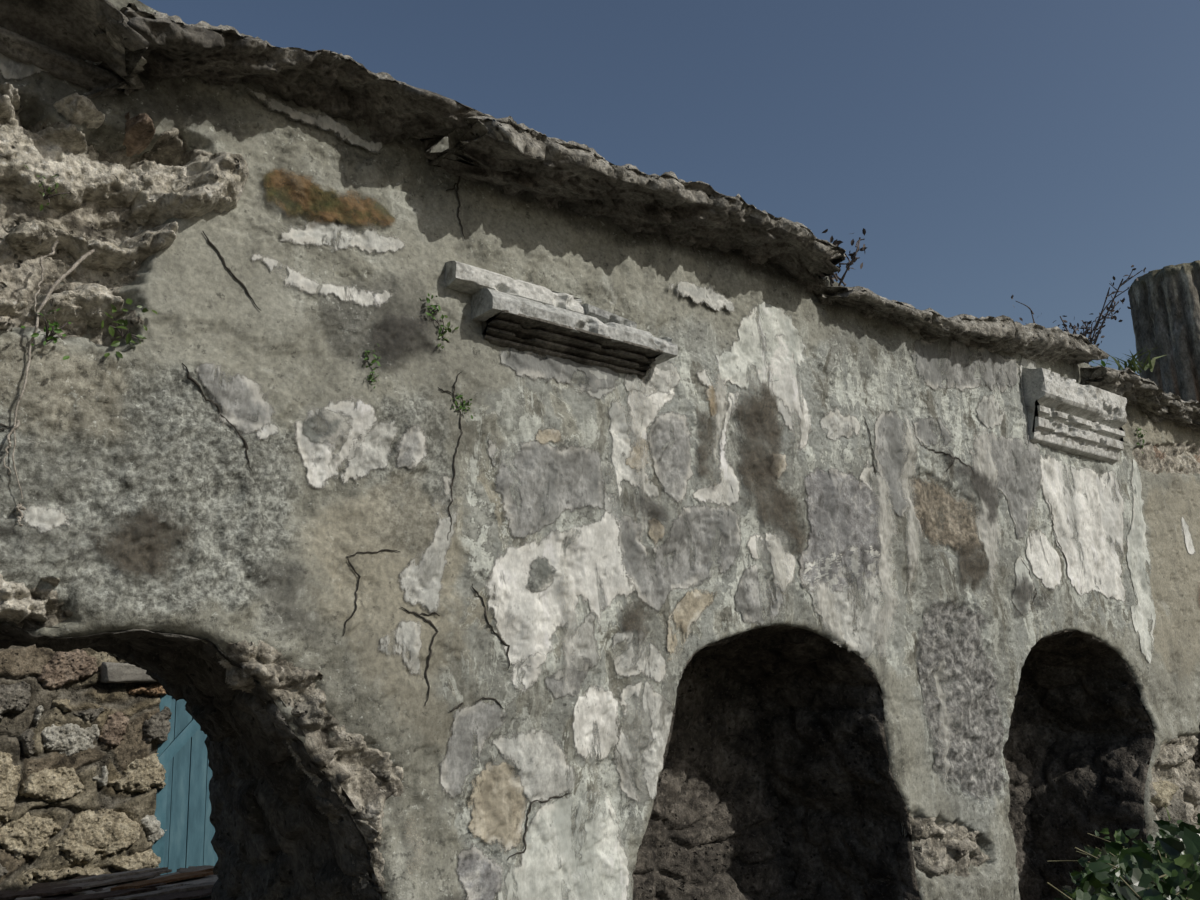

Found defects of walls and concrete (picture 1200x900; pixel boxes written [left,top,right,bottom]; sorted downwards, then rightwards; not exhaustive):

spalling [0,53,249,348]
crack [203,231,261,311]
crack [182,363,252,470]
peeling [294,397,427,488]
crack [343,549,400,636]
peeling [440,281,991,900]
water stain [698,381,806,590]
water stain [817,583,843,645]
water stain [876,418,921,652]
water stain [946,432,1000,587]
peeling [911,339,1200,664]
spalling [216,640,404,895]